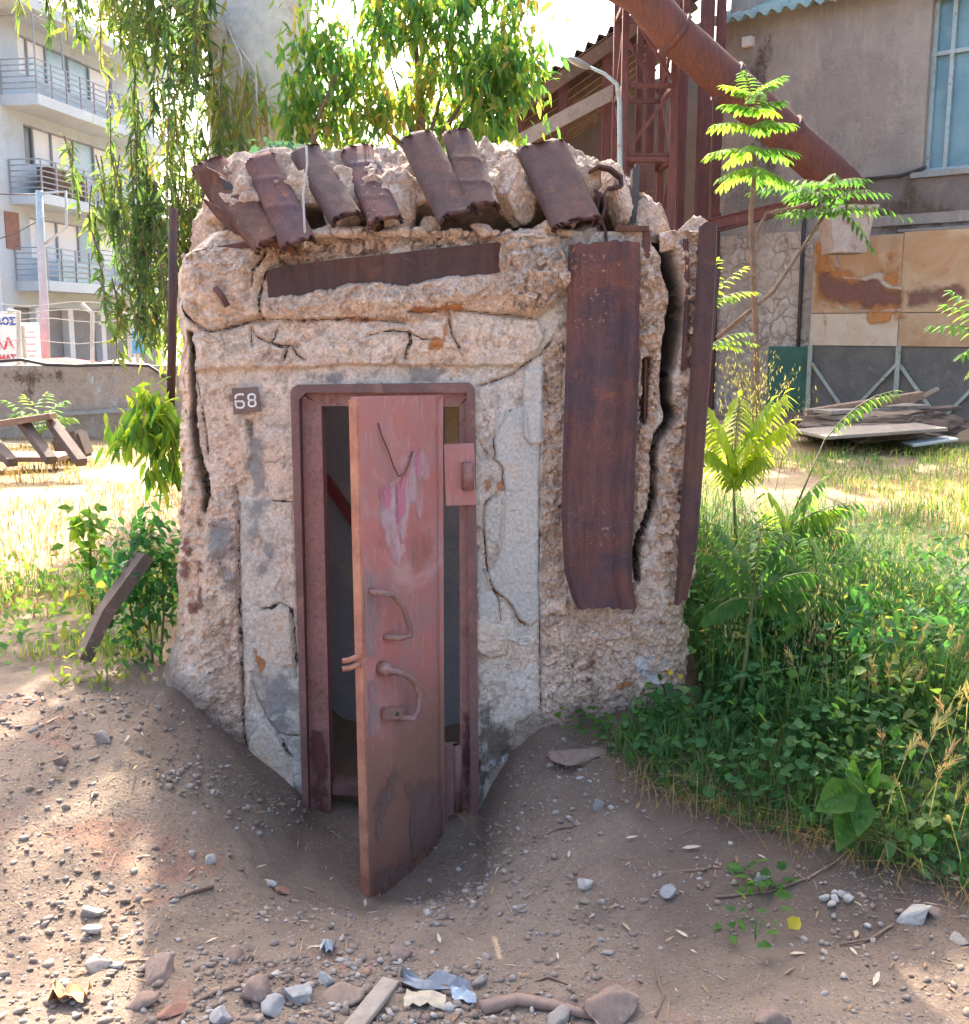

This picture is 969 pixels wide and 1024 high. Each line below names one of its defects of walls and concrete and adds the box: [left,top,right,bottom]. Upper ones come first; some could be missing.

crack [181,253,553,386]
crack [659,368,668,377]
crack [194,384,211,497]
crack [632,426,665,576]
crack [479,436,541,709]